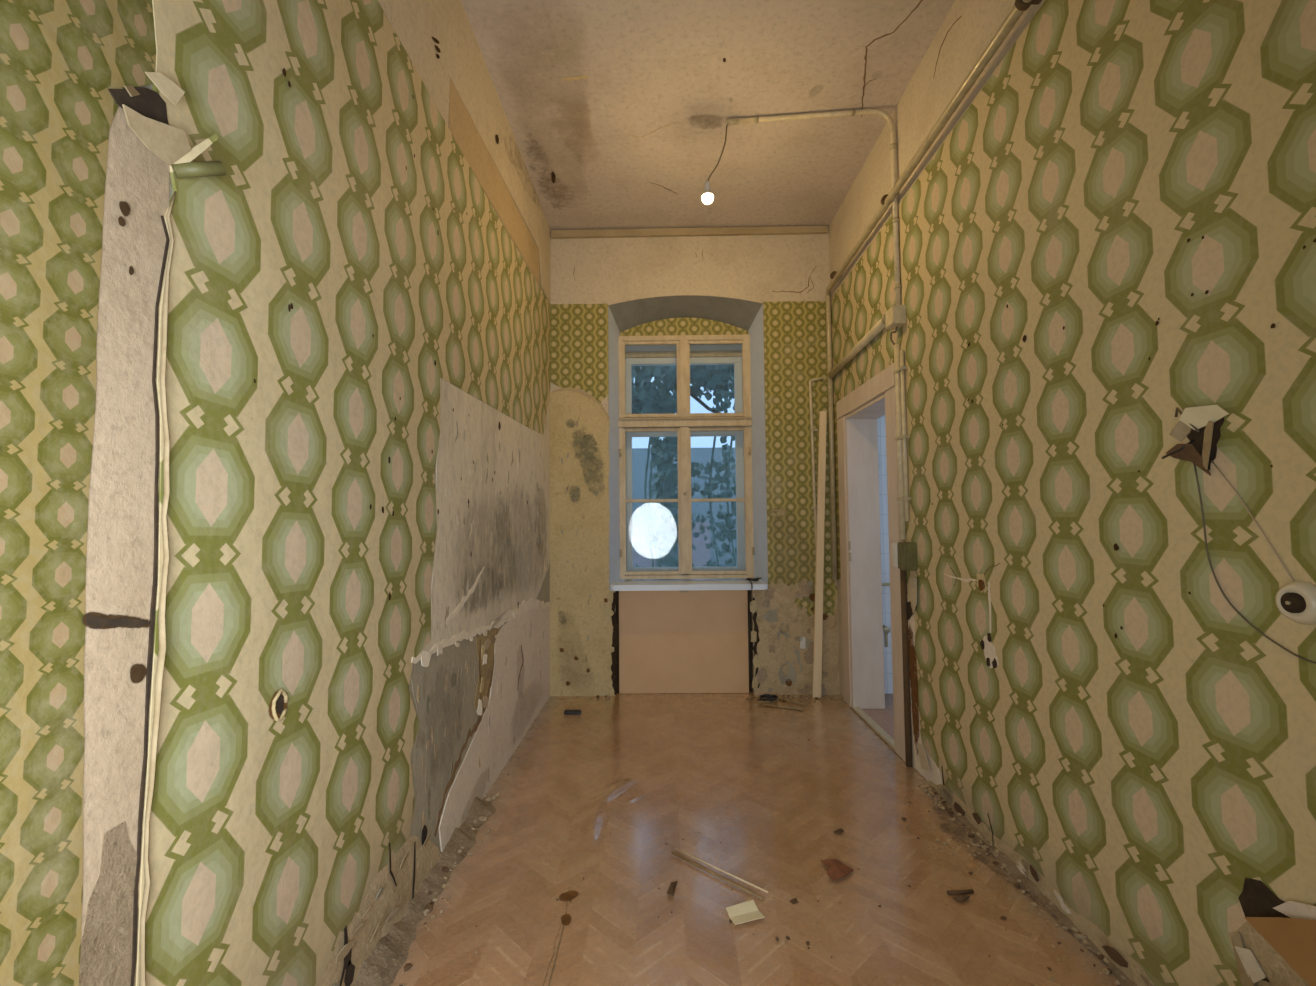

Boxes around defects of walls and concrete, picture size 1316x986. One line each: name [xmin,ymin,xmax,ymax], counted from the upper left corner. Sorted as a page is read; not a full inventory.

crack [861,0,923,117]
spalling [275,694,284,715]
peeling [319,378,619,986]
flaking render [750,579,840,695]